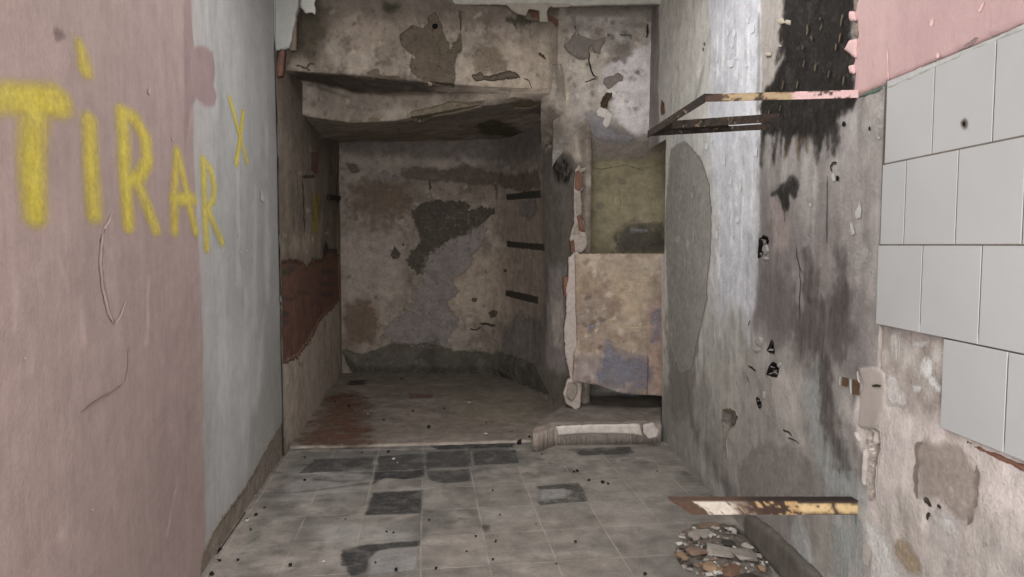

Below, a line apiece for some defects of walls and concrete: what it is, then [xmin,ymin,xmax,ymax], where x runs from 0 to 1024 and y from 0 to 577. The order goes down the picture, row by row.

spalling [366,10,485,122]
spalling [564,30,632,128]
damp [759,41,789,106]
damp [759,111,839,167]
crack [82,347,129,412]
crack [99,215,126,325]
flaking render [279,235,341,364]
spalling [379,199,496,349]
spalling [562,252,582,409]
damp [762,239,869,467]
flaking render [917,441,1024,518]